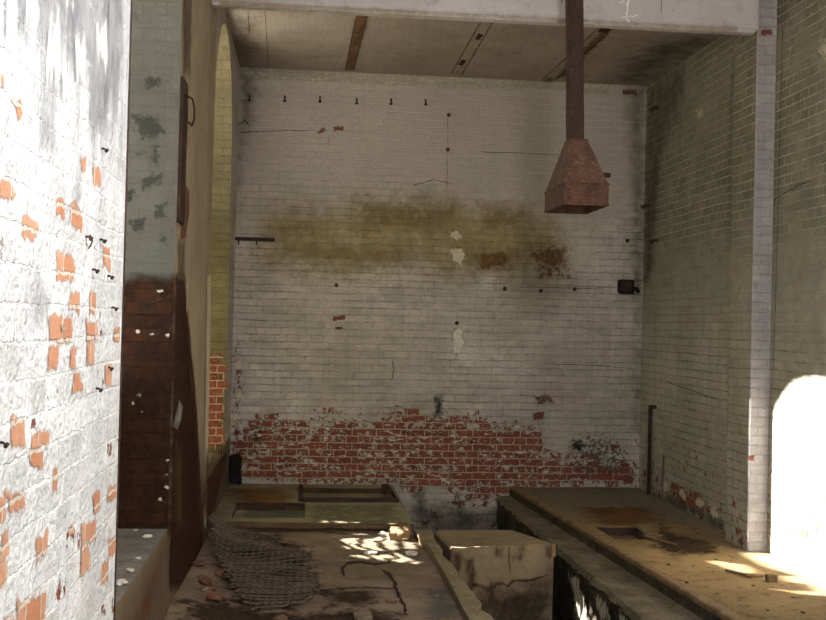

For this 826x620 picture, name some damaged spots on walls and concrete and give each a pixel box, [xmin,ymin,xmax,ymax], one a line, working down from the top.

peeling [46,13,85,90]
peeling [96,23,107,73]
peeling [12,97,24,121]
peeling [0,175,16,201]
peeling [80,157,101,188]
peeling [23,213,39,243]
peeling [56,197,83,233]
peeling [103,246,111,272]
corrosion [531,246,570,278]
peeling [205,273,639,539]
crack [312,569,407,615]
spalling [552,557,627,620]